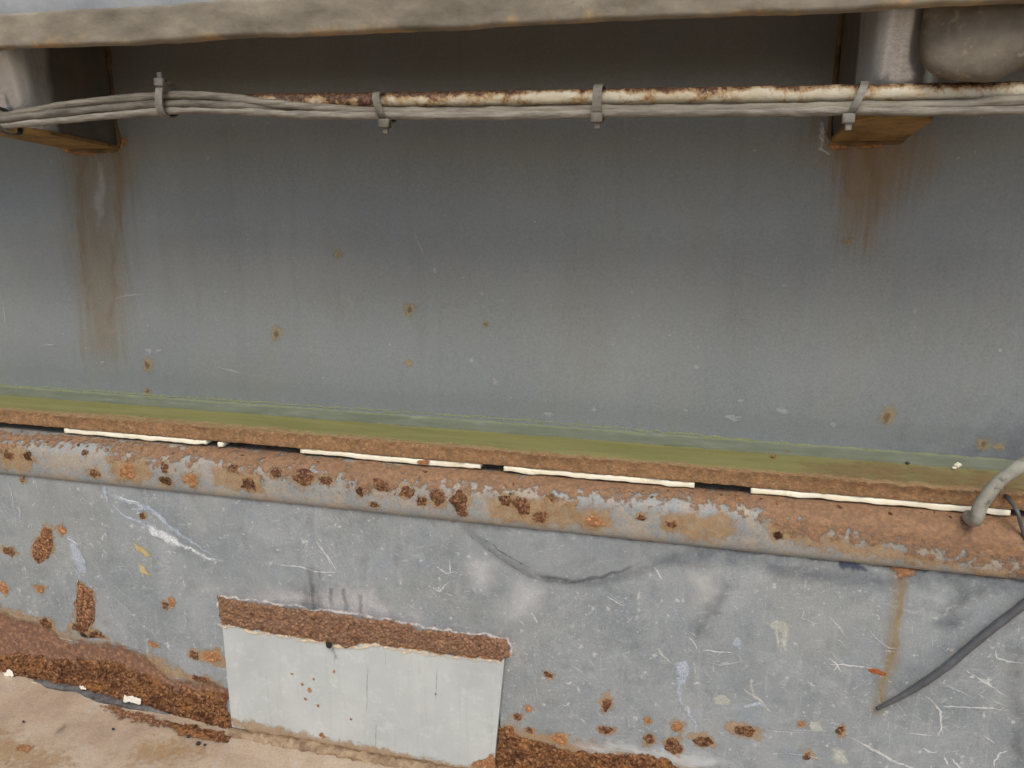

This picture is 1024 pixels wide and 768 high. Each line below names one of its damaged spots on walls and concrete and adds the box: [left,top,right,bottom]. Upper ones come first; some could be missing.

corrosion [0,408,983,491]
corrosion [0,426,1024,579]
corrosion [0,581,716,768]
corrosion [726,722,761,740]